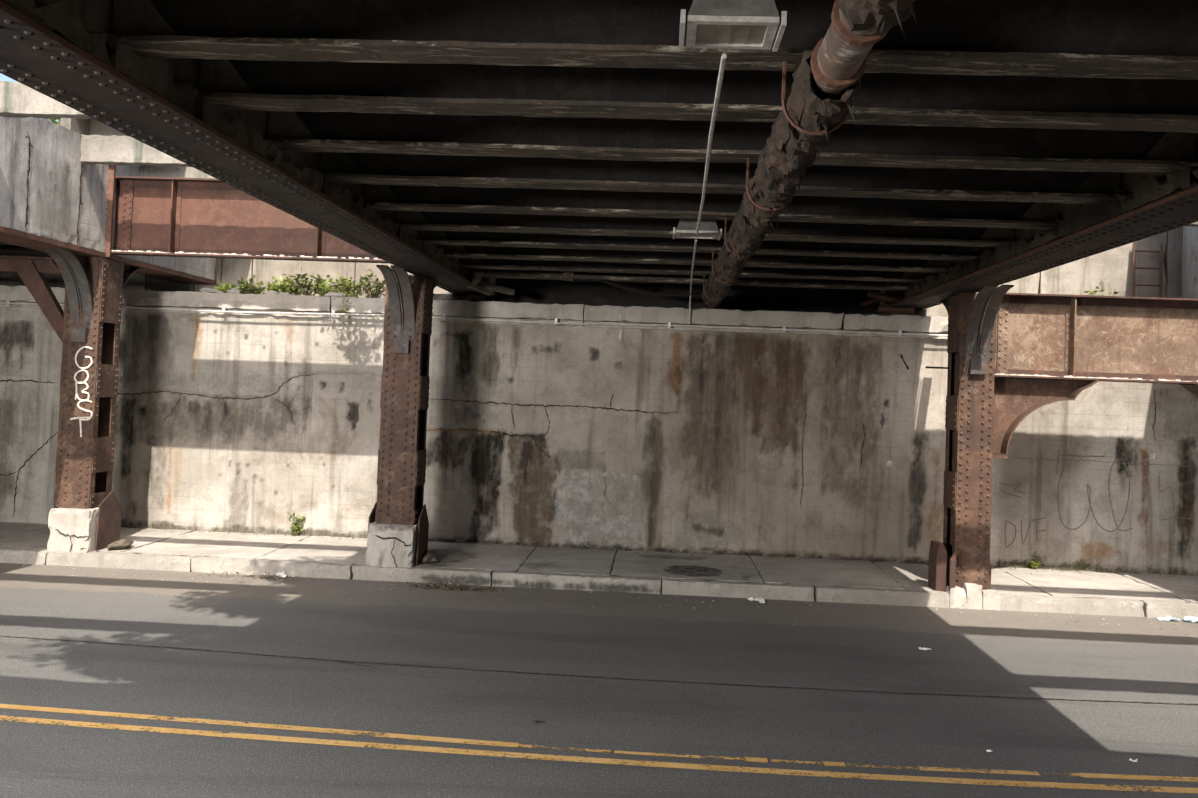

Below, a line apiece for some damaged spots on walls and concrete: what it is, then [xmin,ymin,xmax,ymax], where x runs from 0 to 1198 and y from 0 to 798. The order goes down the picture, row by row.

crack [0,432,58,518]
crack [117,374,318,425]
leakage [457,328,499,390]
leakage [427,432,561,566]
crack [426,394,673,458]
leakage [683,335,806,488]
leakage [908,435,925,550]
corrosion [1136,450,1149,482]
leakage [1165,396,1197,558]